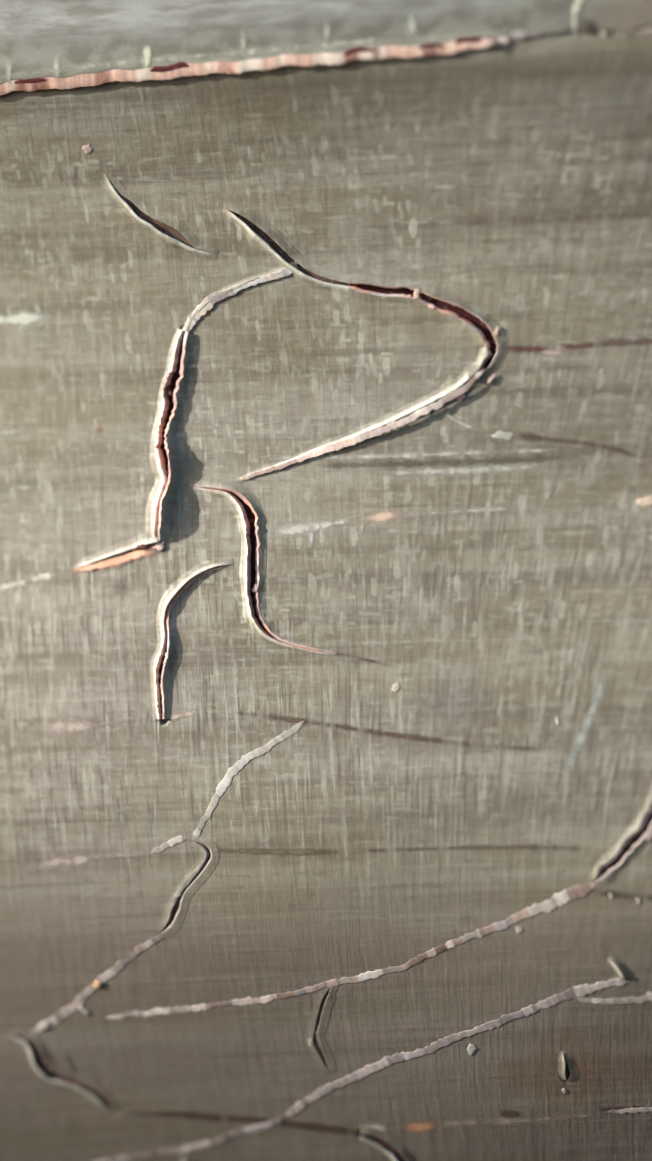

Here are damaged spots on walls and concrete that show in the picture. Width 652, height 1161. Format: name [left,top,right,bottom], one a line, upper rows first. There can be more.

crack [0,0,652,96]
crack [71,201,652,740]
crack [4,715,652,1161]